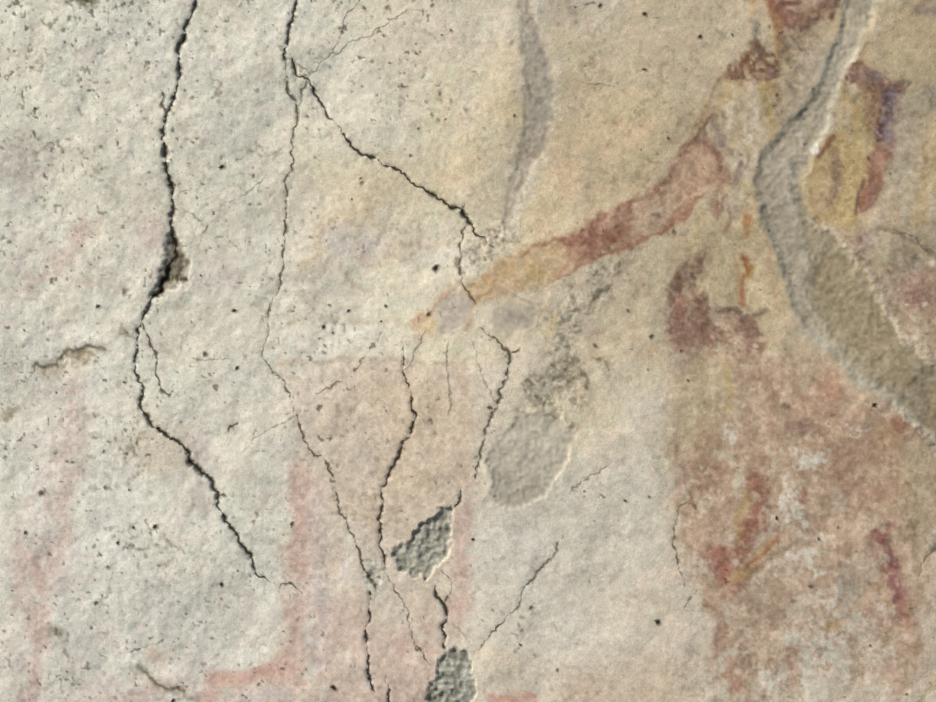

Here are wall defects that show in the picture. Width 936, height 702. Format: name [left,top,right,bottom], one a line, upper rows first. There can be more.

crack [891,231,936,254]
crack [132,0,563,702]
crack [918,547,936,576]